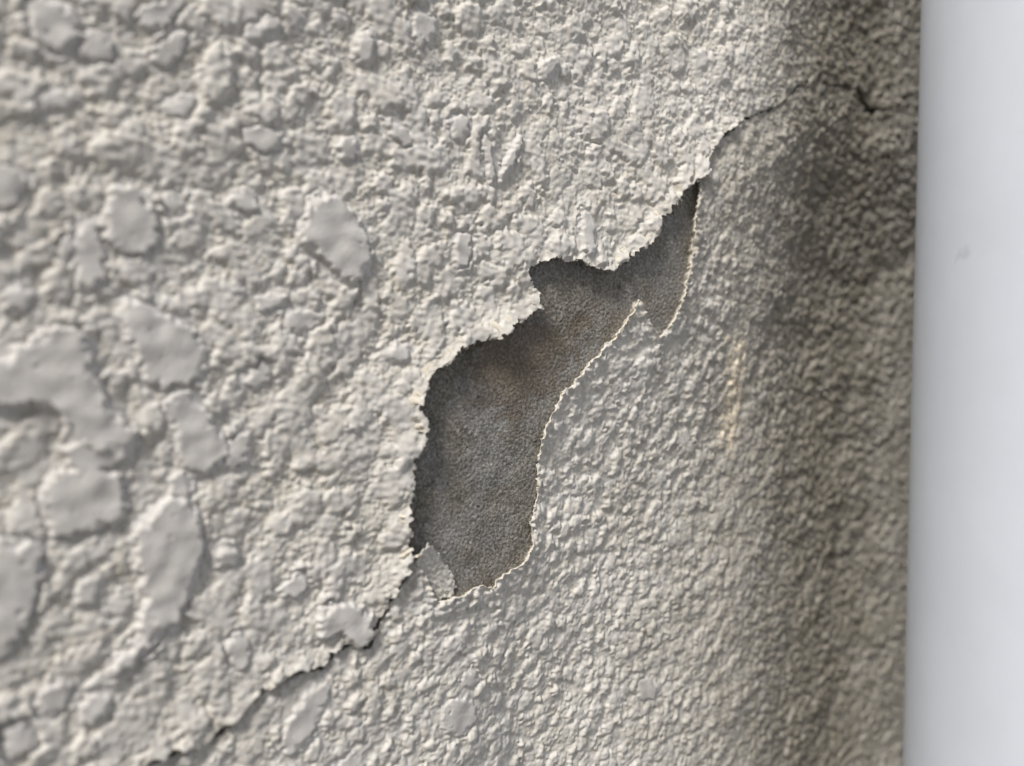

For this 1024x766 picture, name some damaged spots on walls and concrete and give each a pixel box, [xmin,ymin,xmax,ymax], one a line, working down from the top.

crack [712,79,913,150]
peeling [393,162,713,614]